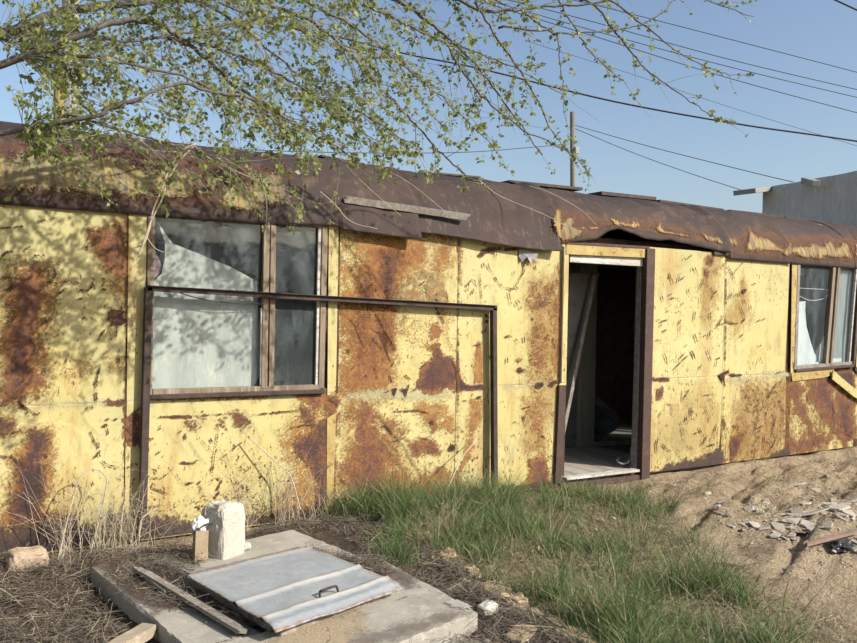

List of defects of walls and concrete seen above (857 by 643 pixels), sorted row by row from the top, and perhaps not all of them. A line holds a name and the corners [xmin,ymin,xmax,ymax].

peeling [0,151,286,213]
peeling [656,223,857,259]
corrosion [0,214,490,557]
corrosion [487,259,561,493]
corrosion [651,254,857,473]